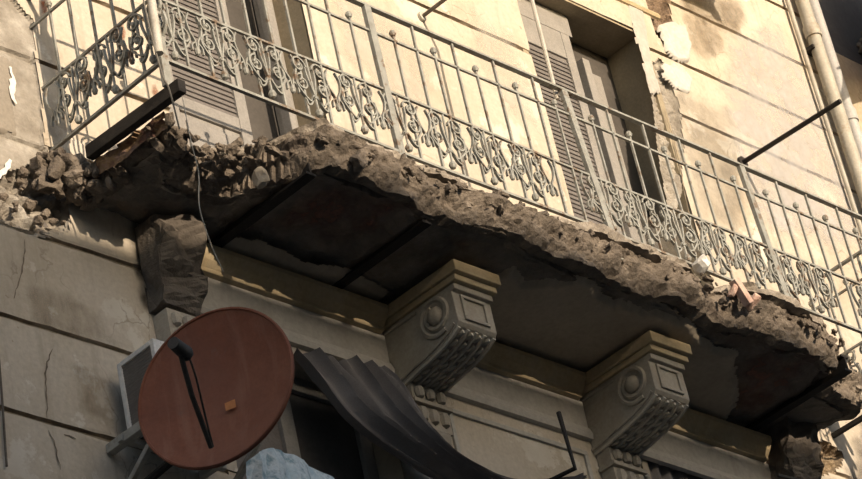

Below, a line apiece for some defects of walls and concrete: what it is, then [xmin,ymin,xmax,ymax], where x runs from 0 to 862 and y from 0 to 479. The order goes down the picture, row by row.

flaking render [646,0,672,42]
flaking render [0,0,71,239]
crack [14,240,26,298]
spalling [97,124,862,426]
crack [44,349,76,470]
flaking render [819,440,844,476]